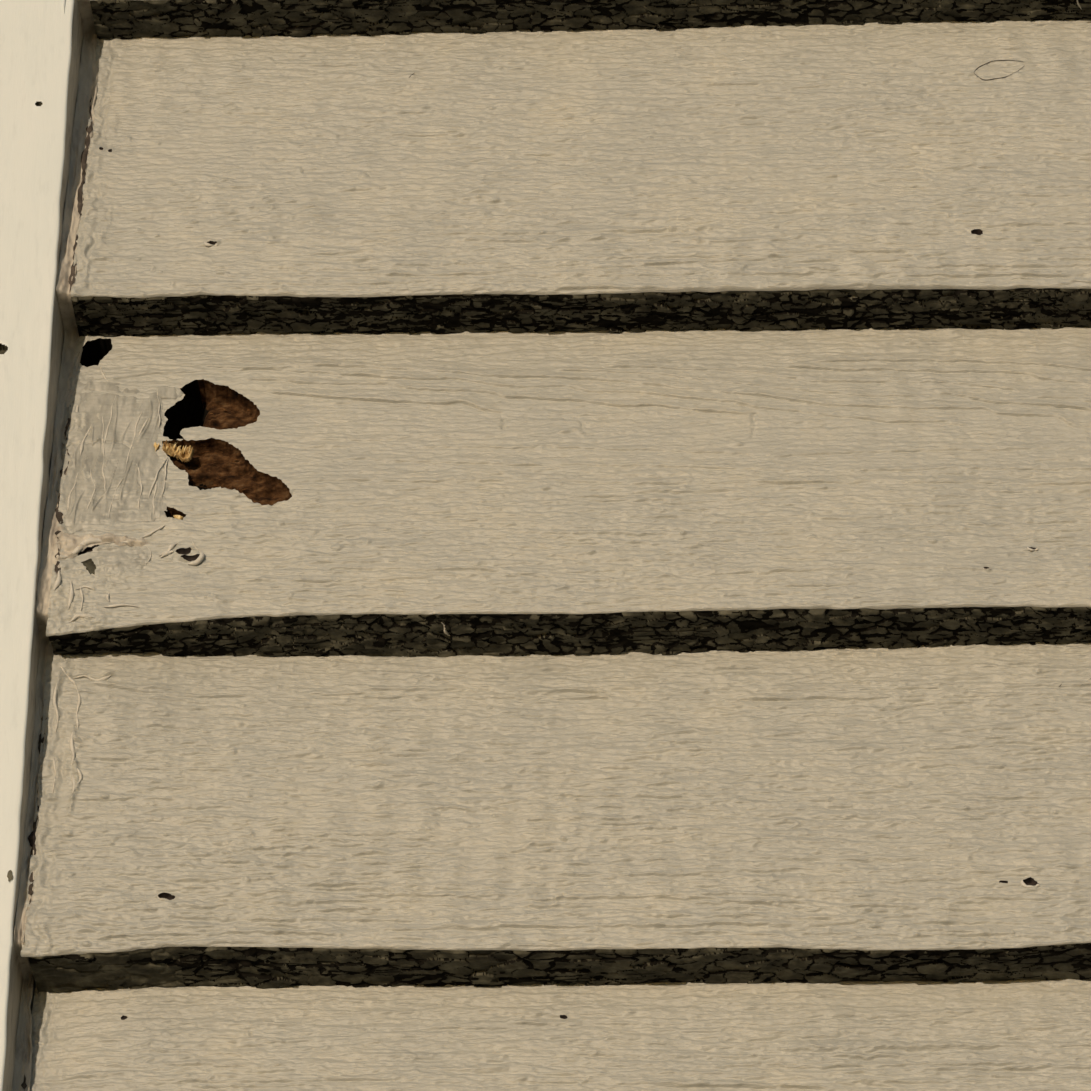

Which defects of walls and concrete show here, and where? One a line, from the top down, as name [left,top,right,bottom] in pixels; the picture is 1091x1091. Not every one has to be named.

spalling [162,379,292,506]
peeling [52,525,205,623]